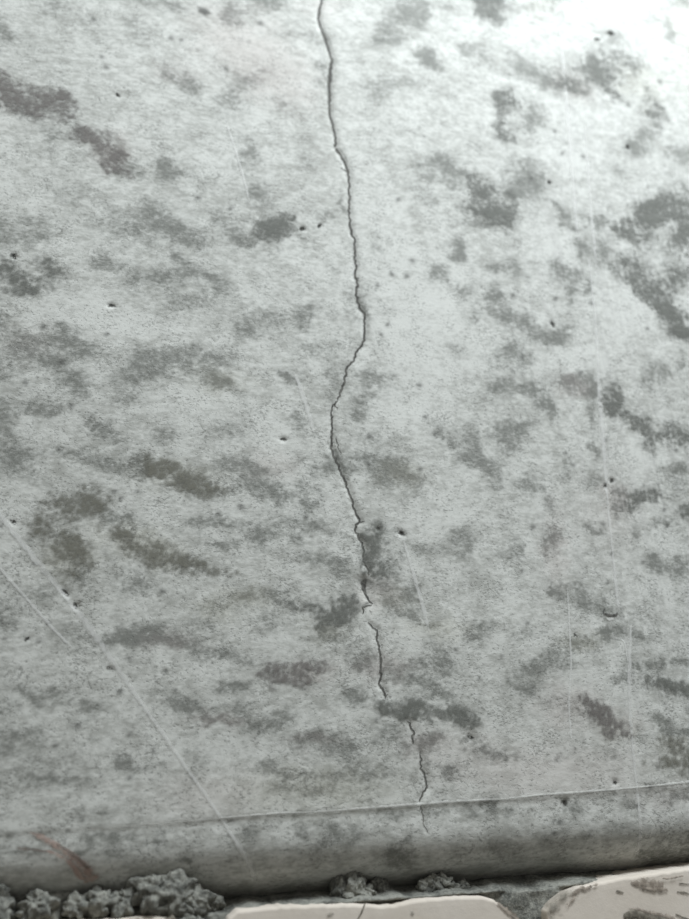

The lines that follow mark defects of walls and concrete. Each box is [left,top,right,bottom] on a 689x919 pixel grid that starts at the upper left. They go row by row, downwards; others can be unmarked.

crack [317,0,387,698]
crack [407,721,428,833]